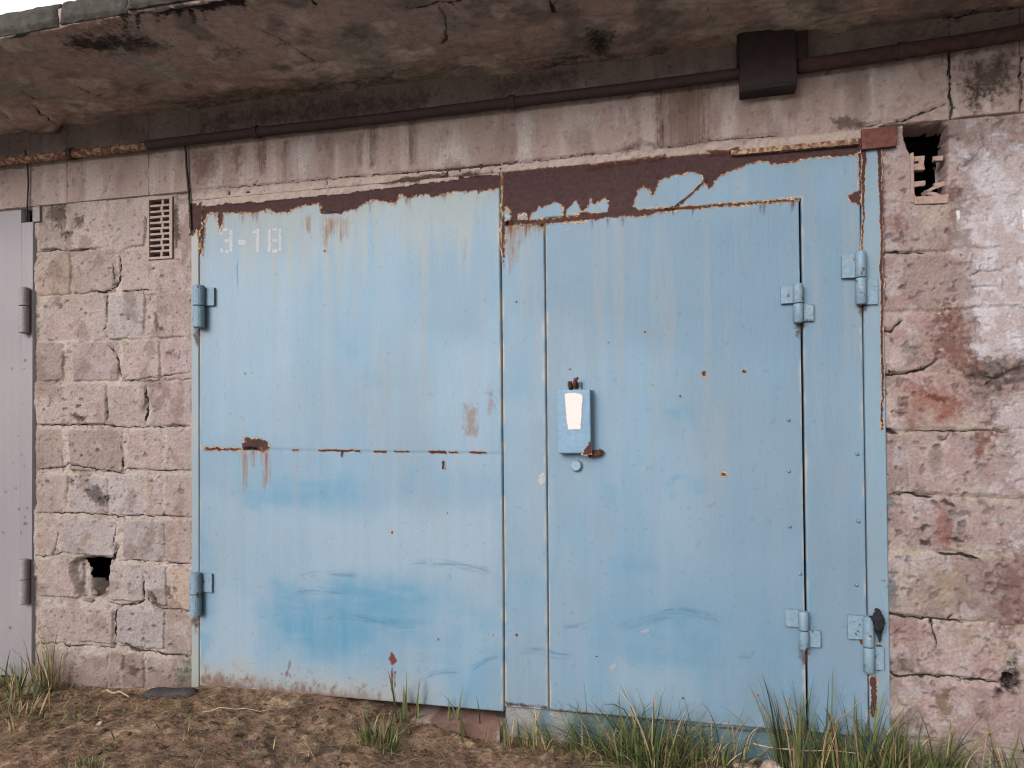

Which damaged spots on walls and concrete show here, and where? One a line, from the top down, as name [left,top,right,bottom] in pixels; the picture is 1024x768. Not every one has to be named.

water stain [57,0,246,56]
crack [416,0,462,44]
crack [861,52,955,127]
spalling [587,154,666,170]
spalling [708,147,739,156]
spalling [385,171,479,184]
corrosion [187,140,886,430]
corrosion [203,437,271,464]
corrosion [318,448,360,457]
corrosion [428,450,486,470]
crack [889,613,962,644]
crack [891,672,996,682]